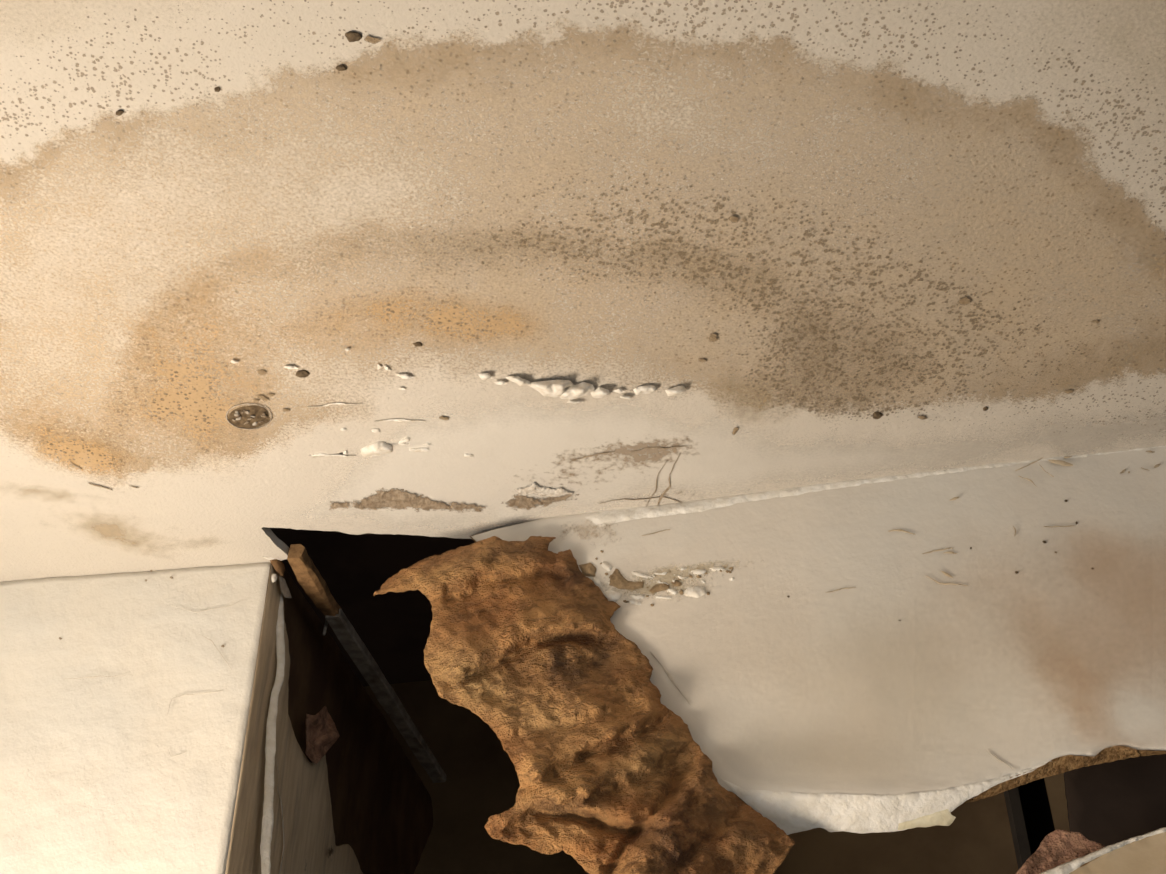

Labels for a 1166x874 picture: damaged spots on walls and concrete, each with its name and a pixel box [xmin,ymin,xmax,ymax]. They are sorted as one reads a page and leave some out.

leakage [0,28,1166,474]
flaking render [330,488,486,512]
flaking render [502,483,579,510]
flaking render [263,556,285,583]
flaking render [579,550,735,606]